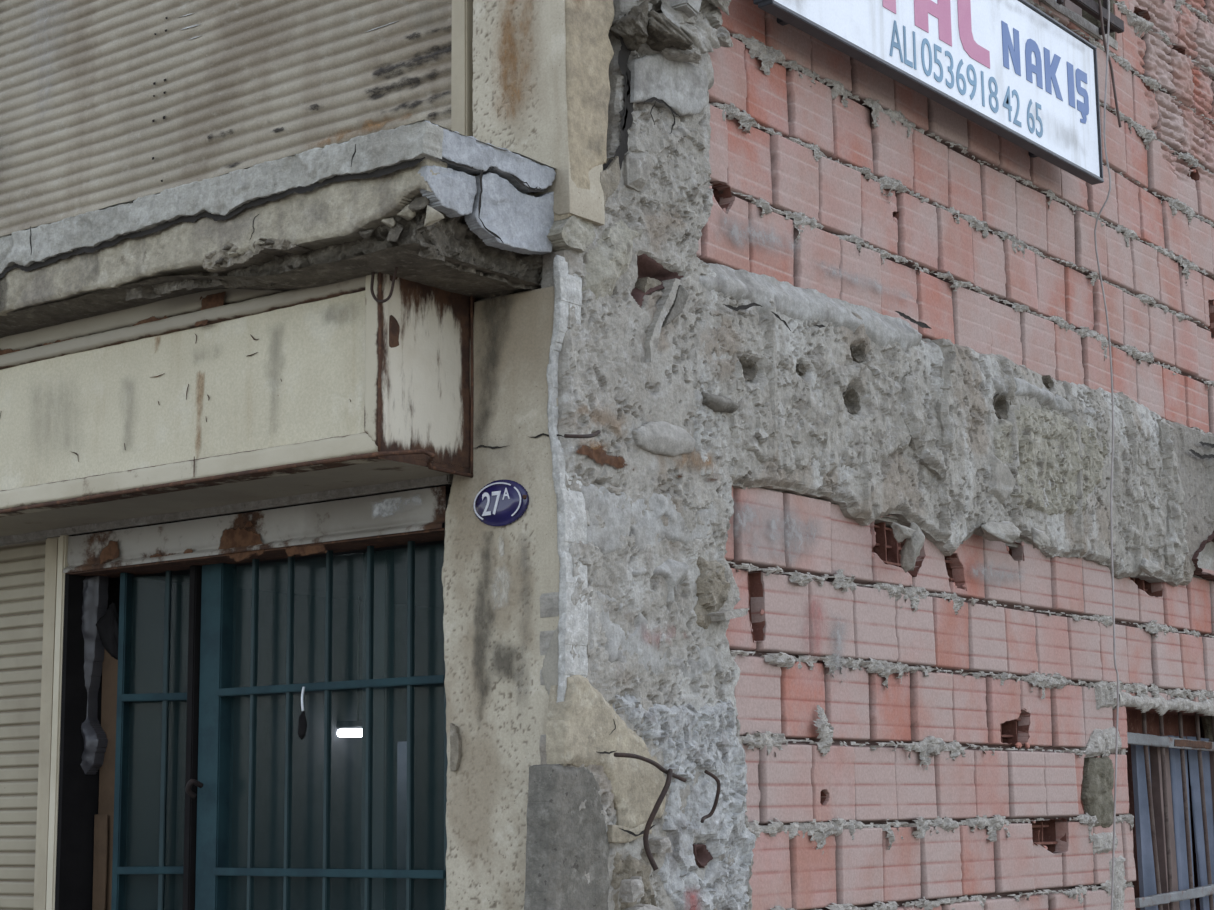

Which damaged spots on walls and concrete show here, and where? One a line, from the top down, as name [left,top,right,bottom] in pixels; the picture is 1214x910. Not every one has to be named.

crack [0,144,546,278]
spalling [600,121,732,212]
spalling [1205,300,1214,338]
spalling [701,351,912,476]
spalling [986,404,1178,552]
spalling [125,197,766,910]
leakage [474,539,514,699]
spalling [870,522,926,577]
spalling [944,554,967,591]
spalling [1128,577,1163,596]
spalling [1192,531,1214,581]
spalling [1000,708,1030,749]